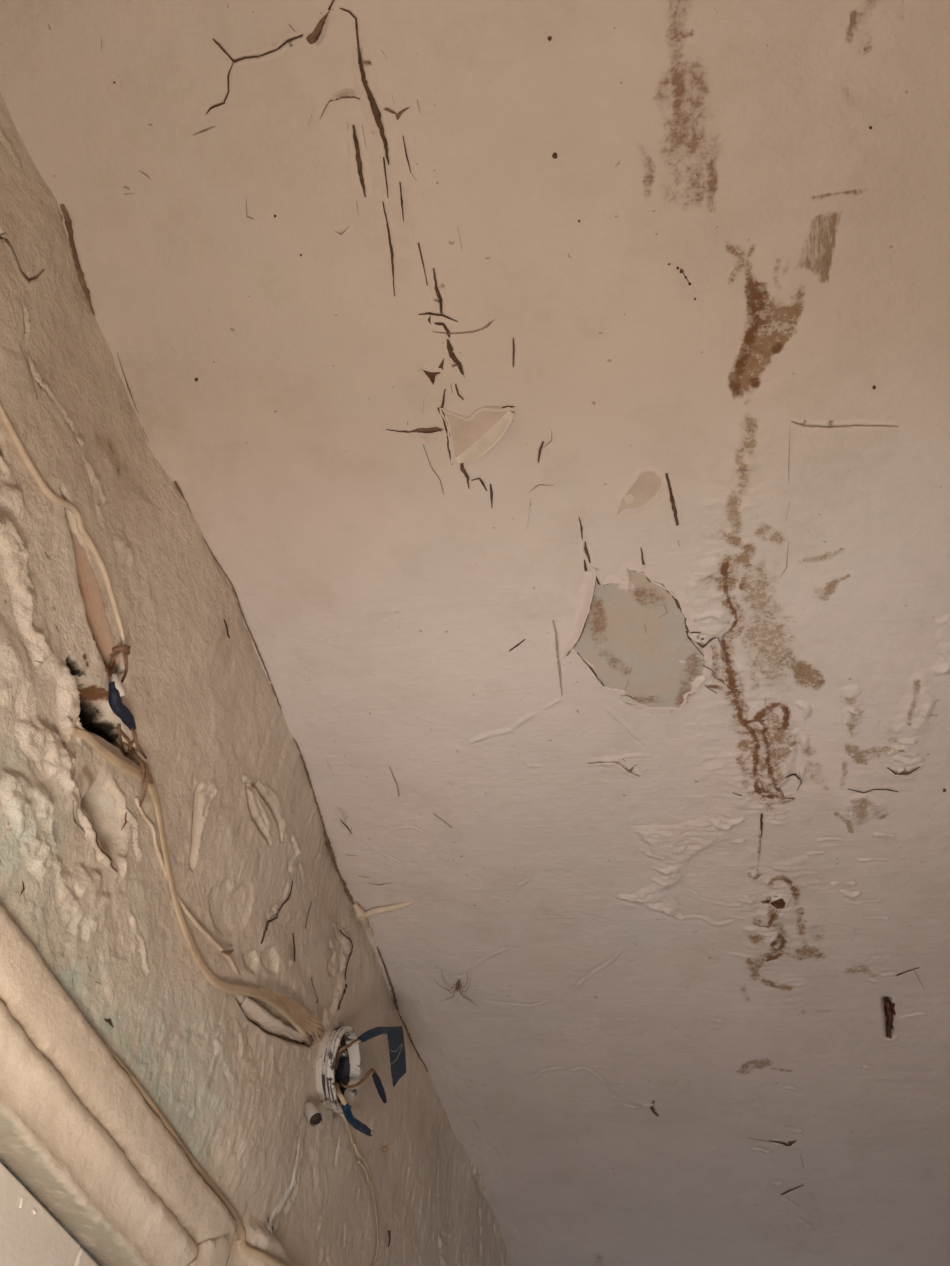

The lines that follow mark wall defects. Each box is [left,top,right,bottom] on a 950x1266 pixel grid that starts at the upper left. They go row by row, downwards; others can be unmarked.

crack [193,25,305,136]
damp [658,63,707,153]
crack [0,204,95,316]
crack [335,8,521,425]
damp [806,214,837,282]
peeling [386,405,515,508]
peeling [610,465,665,519]
damp [728,420,756,533]
peeling [556,562,714,714]
damp [744,567,825,690]
damp [820,575,850,600]
damp [842,699,903,775]